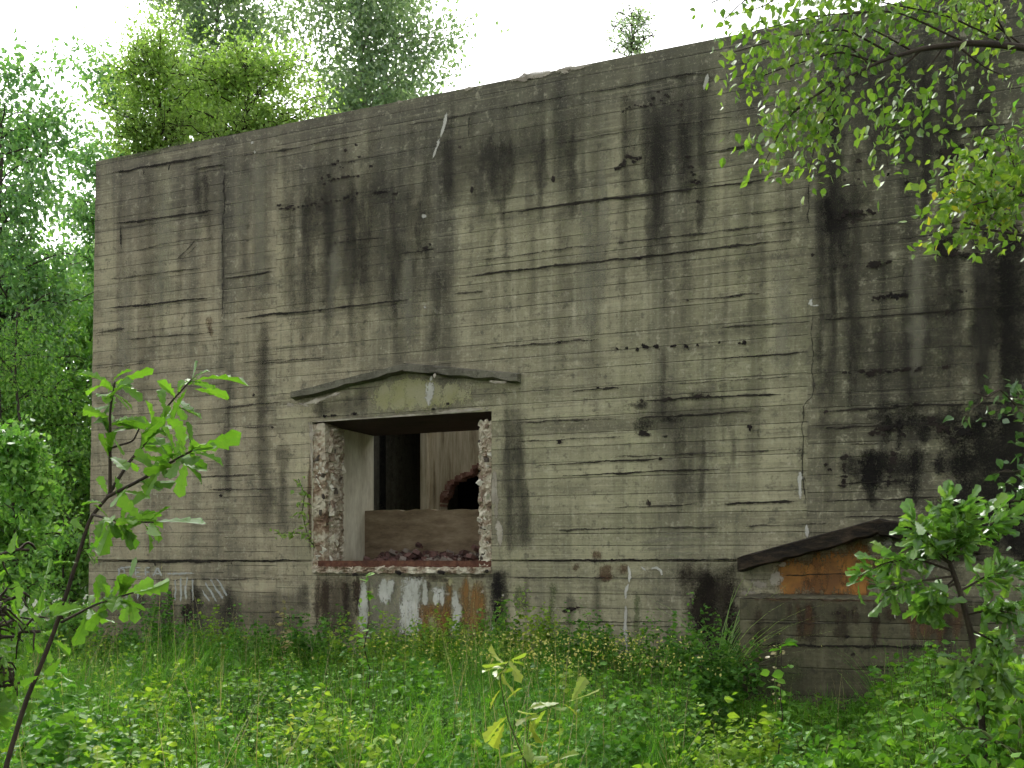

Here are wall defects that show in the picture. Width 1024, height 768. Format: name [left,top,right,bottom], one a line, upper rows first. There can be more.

flaking render [307,402,489,561]
spalling [440,424,504,573]
crack [520,300,1021,532]
leakage [861,417,902,508]
leakage [935,415,1024,560]
peeling [352,570,463,645]
corrosion [410,574,488,651]
leakage [678,560,764,659]
corrosion [755,540,880,602]